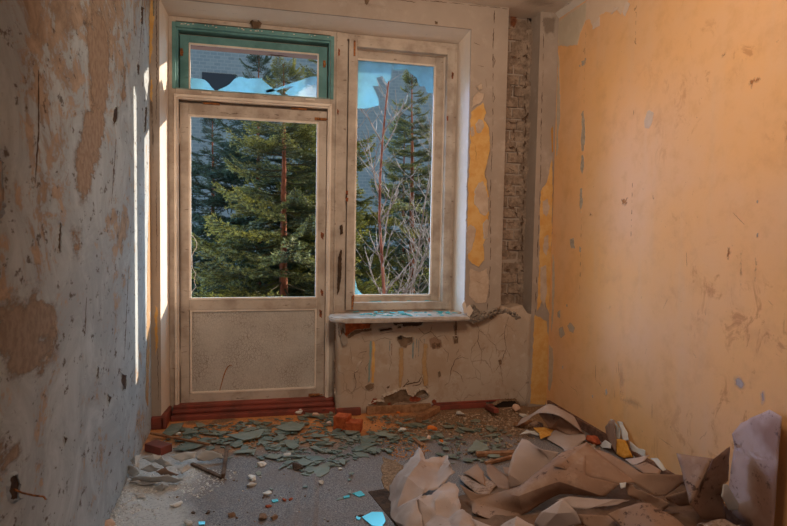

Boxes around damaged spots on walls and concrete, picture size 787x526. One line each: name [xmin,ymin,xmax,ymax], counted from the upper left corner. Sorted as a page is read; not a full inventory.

crack [139,0,158,119]
peeling [558,0,630,48]
crack [33,70,41,183]
crack [152,182,160,276]
crack [402,0,545,384]
flaking render [461,18,533,324]
peeling [529,155,568,405]
flaking render [333,322,437,406]
spalling [490,398,520,408]